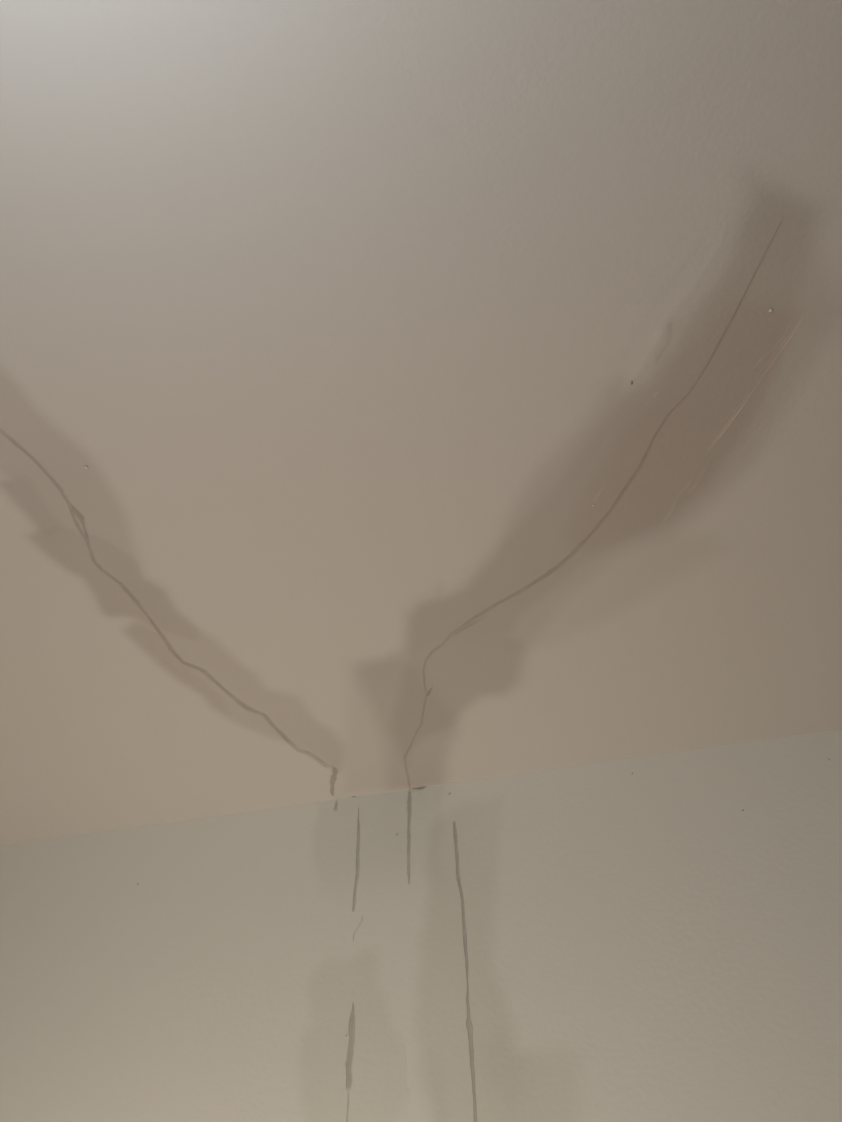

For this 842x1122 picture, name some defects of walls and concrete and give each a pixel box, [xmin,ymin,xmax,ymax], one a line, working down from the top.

crack [0,429,363,941]
damp [0,352,603,1122]
crack [344,1004,355,1122]
crack [453,821,477,1122]
damp [339,142,842,793]
crack [403,216,783,885]